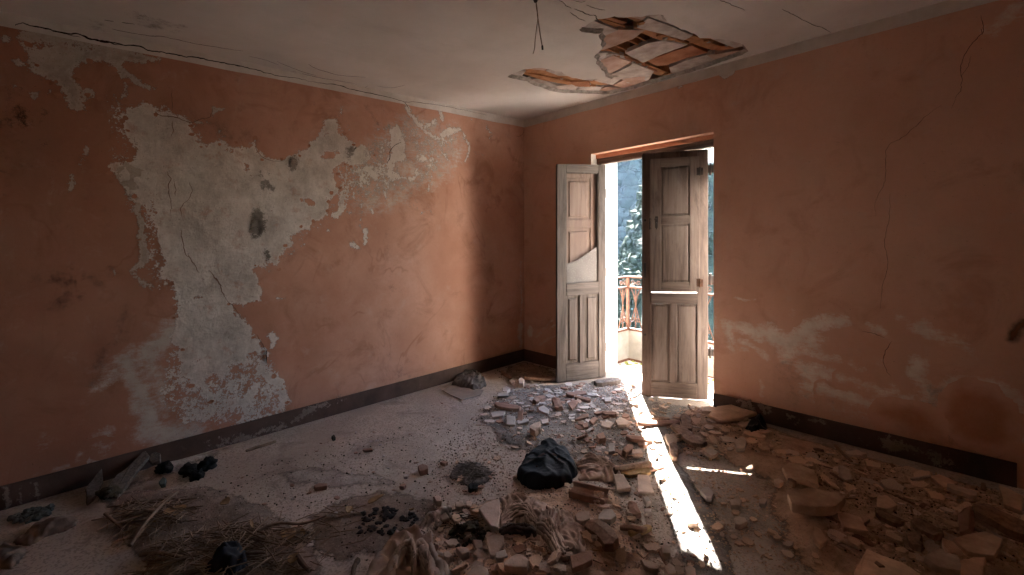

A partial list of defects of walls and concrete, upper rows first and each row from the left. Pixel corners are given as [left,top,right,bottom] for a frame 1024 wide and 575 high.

crack [15,20,481,114]
spalling [508,14,748,95]
crack [167,172,267,362]
peeling [0,30,492,435]
leakage [714,306,1024,457]